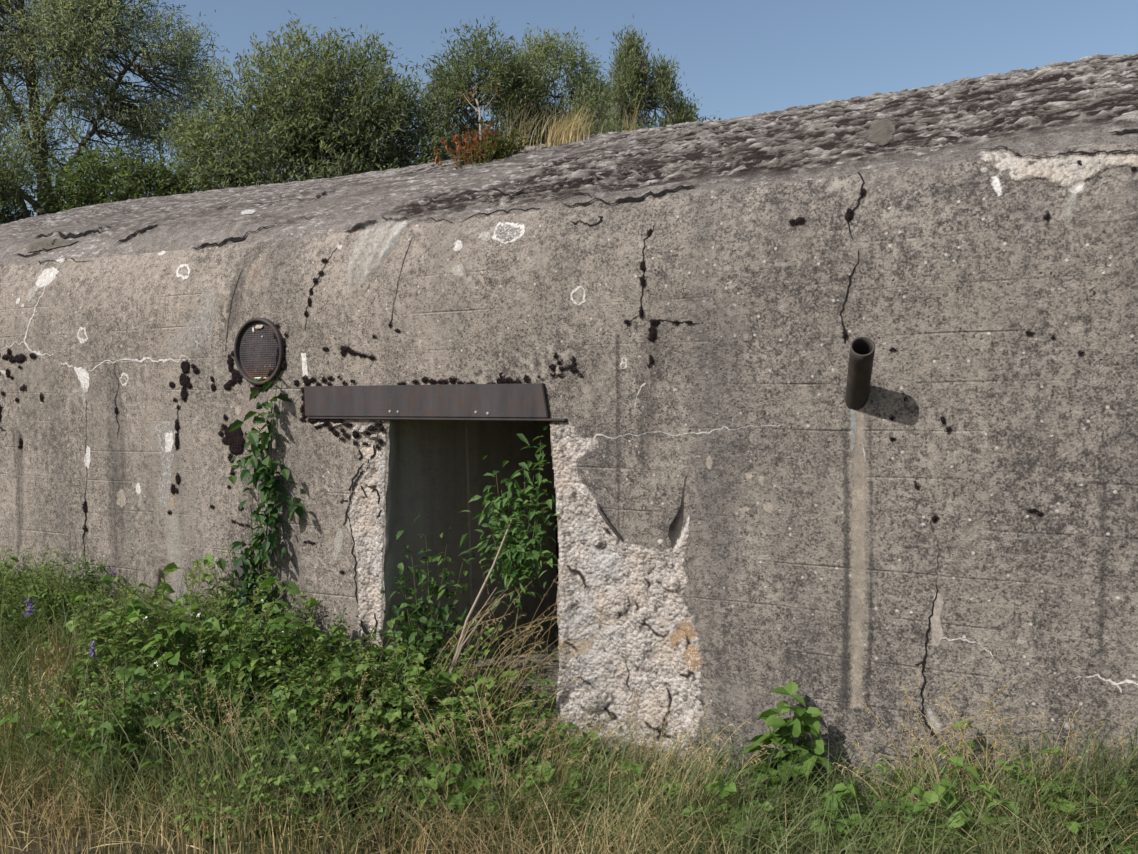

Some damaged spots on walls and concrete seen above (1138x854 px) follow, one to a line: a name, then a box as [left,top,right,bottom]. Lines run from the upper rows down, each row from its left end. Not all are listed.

crack [192,191,326,249]
crack [304,176,698,338]
crack [840,172,867,344]
spalling [979,151,1138,198]
crack [340,459,381,604]
spalling [550,422,705,768]
leakage [841,408,872,708]
crack [915,518,992,737]